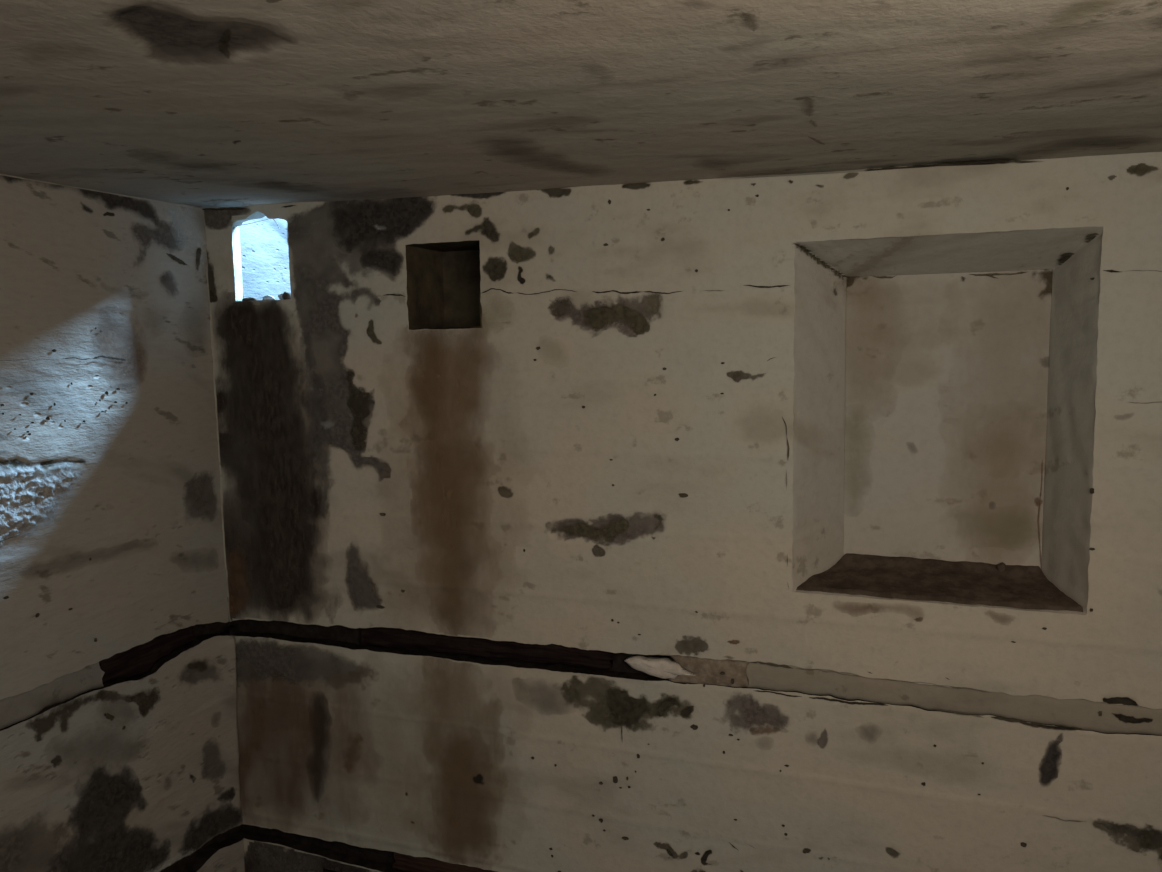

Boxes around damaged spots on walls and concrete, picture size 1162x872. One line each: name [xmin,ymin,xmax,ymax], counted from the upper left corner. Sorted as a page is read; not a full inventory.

leakage [538,188,571,198]
crack [480,285,789,295]
leakage [78,188,540,621]
leakage [29,688,159,742]
leakage [561,676,694,735]
leakage [0,768,242,872]
leakage [244,841,369,872]
leakage [1093,821,1162,859]